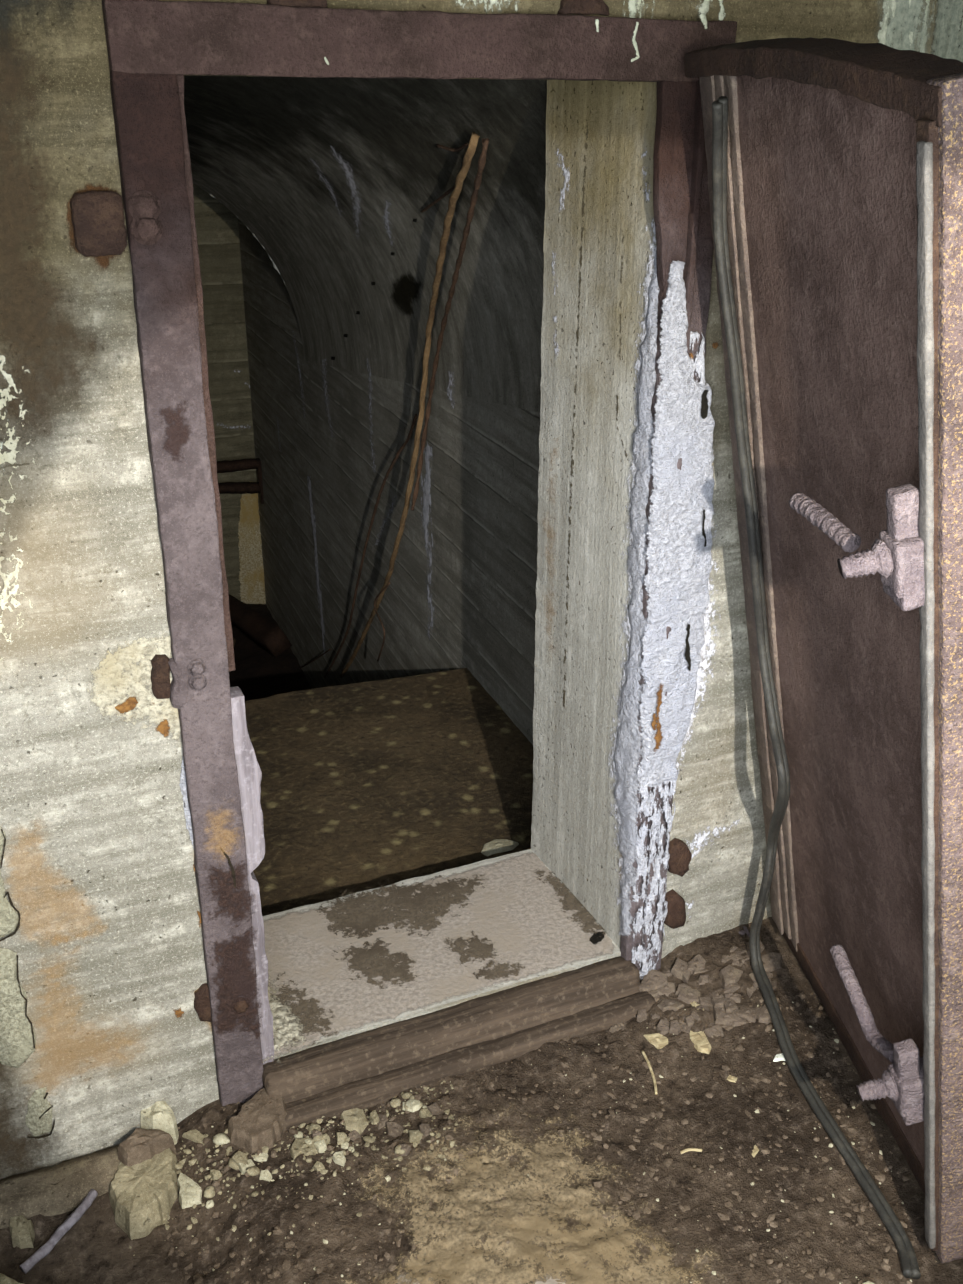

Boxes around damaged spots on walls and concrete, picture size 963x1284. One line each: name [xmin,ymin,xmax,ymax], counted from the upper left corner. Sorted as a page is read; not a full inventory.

damp [456,0,517,12]
damp [624,0,655,18]
damp [699,0,726,21]
damp [878,0,963,62]
damp [0,0,97,642]
rust [160,401,191,462]
damp [421,442,435,638]
crack [0,829,35,1049]
rust [209,864,262,1039]
damp [317,874,523,990]
damp [271,972,337,1050]
crack [27,1093,55,1139]